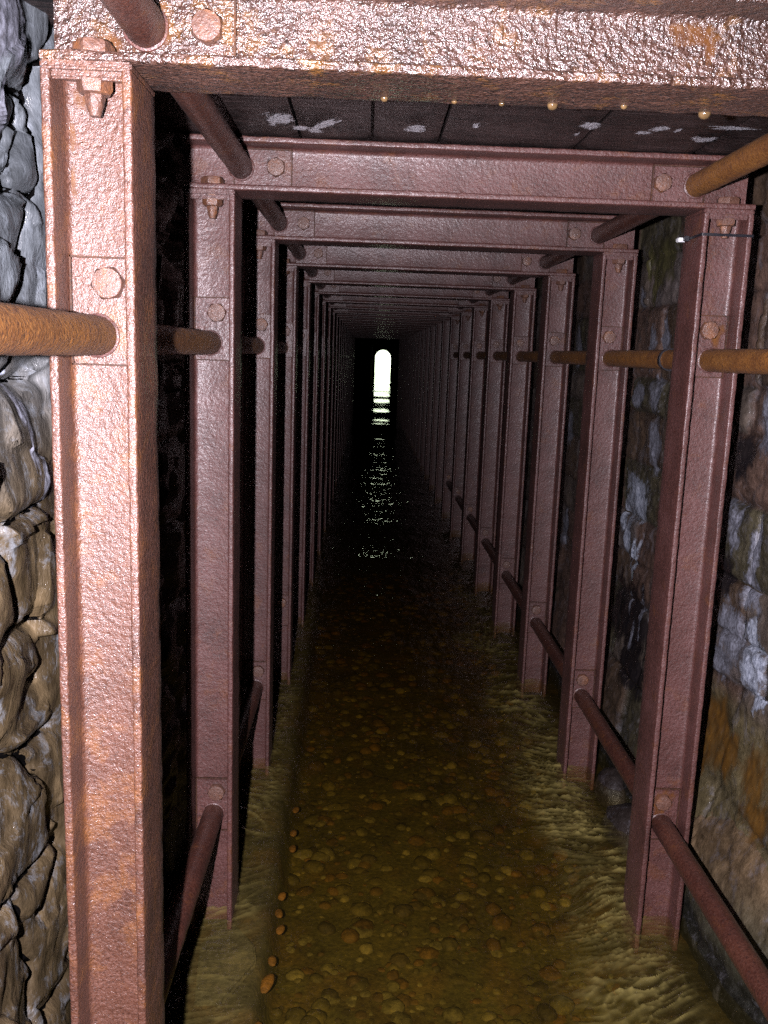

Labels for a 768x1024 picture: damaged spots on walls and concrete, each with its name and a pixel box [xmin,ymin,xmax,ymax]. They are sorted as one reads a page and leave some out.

damp [265,110,342,133]
damp [692,126,756,142]